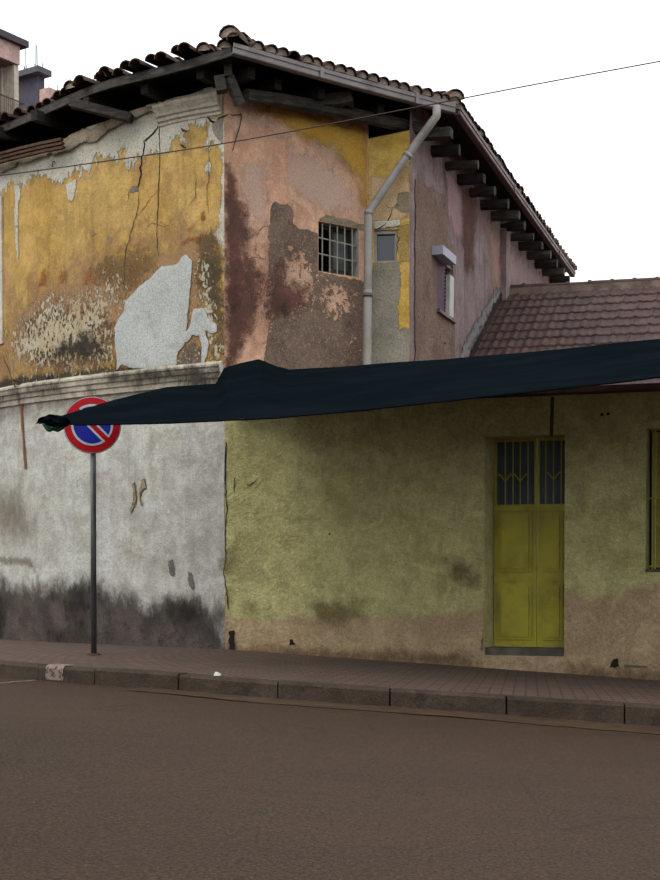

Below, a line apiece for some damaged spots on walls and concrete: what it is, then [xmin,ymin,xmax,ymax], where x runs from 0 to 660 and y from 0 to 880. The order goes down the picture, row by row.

peeling [0,87,228,260]
leakage [0,163,266,388]
crack [123,126,169,287]
leakage [0,577,472,666]